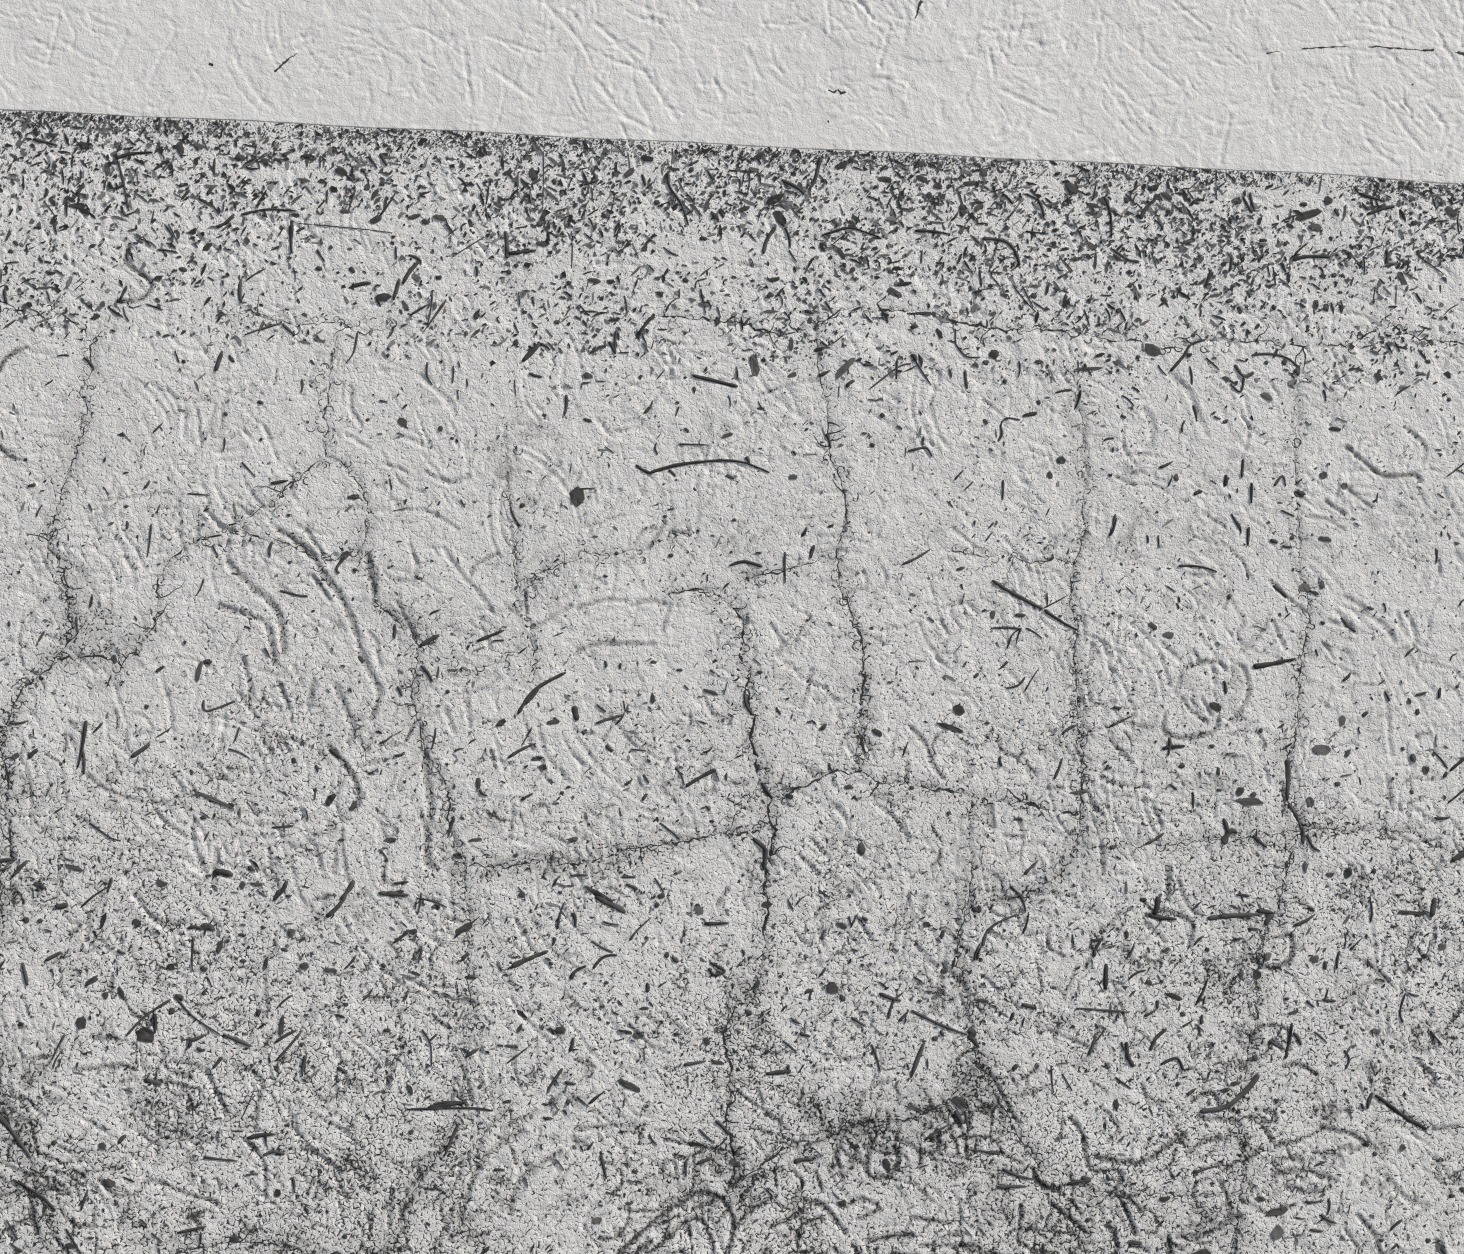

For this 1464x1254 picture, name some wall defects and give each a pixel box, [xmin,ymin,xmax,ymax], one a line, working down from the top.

crack [0,243,1448,1254]
crack [1375,1089,1464,1135]